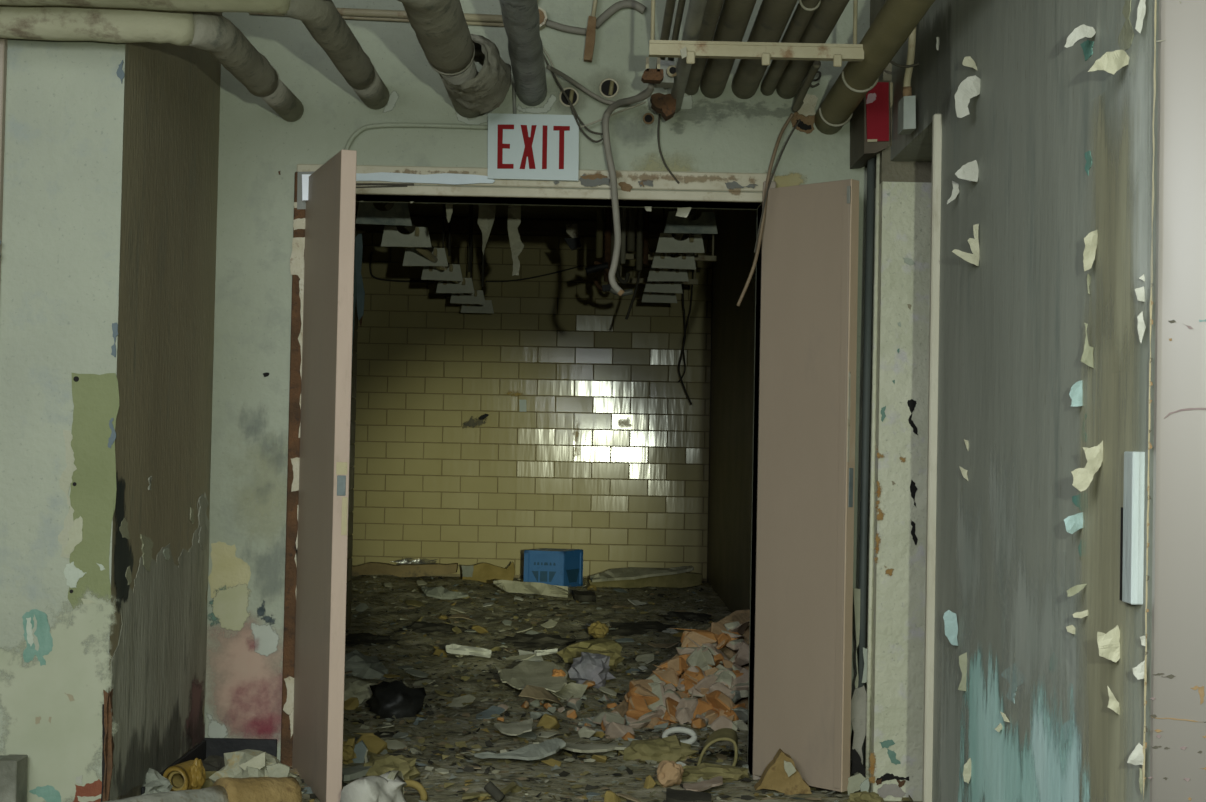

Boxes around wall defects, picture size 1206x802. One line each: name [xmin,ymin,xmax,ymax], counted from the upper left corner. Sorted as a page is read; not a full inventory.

peeling [478,204,524,276]
rust [579,173,653,192]
peeling [676,207,691,218]
peeling [943,0,1148,802]
peeling [252,457,300,518]
peeling [0,373,279,802]
peeling [880,740,901,765]